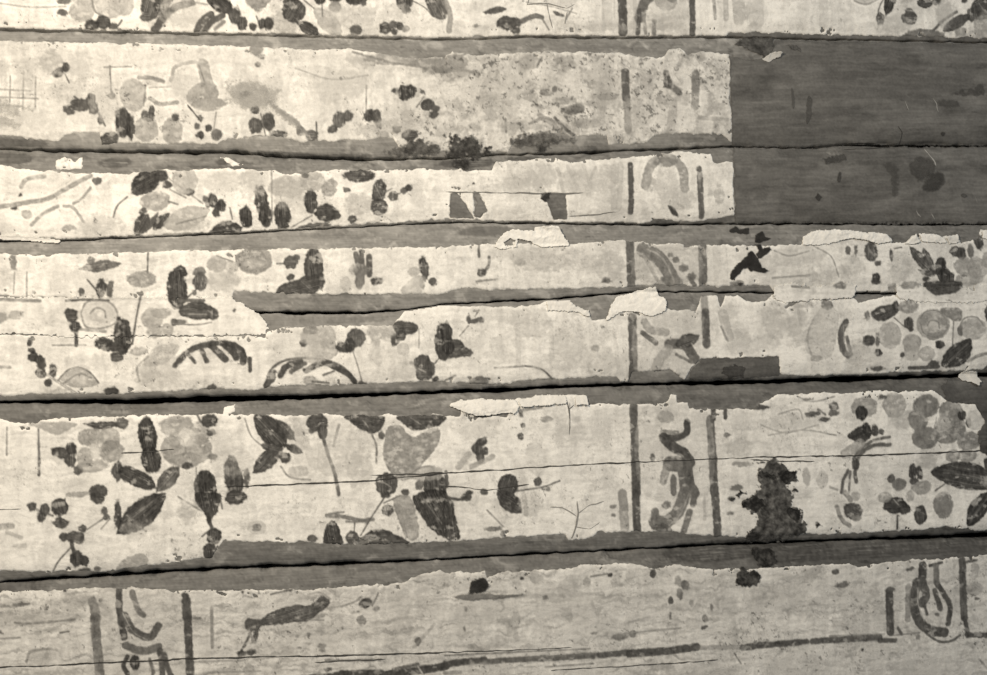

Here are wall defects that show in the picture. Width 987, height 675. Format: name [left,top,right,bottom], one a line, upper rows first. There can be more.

peeling [729,40,987,245]
peeling [0,295,269,338]
peeling [547,300,590,316]
peeling [606,287,667,320]
peeling [941,368,987,455]
water stain [729,457,820,587]